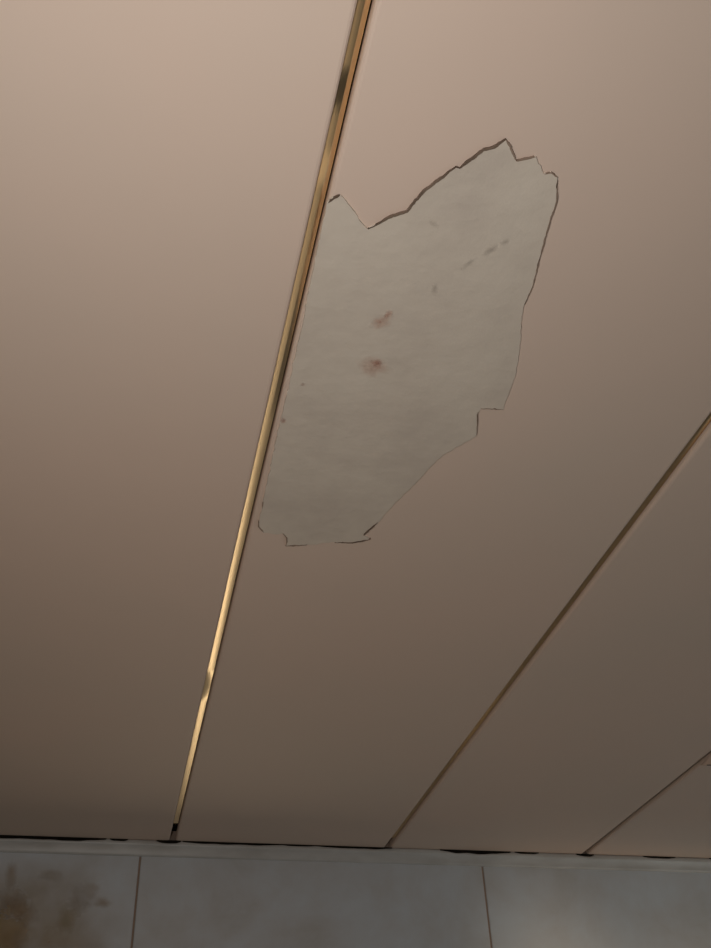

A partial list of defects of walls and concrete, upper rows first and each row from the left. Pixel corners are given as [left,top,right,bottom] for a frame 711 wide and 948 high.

peeling [258,138,558,547]